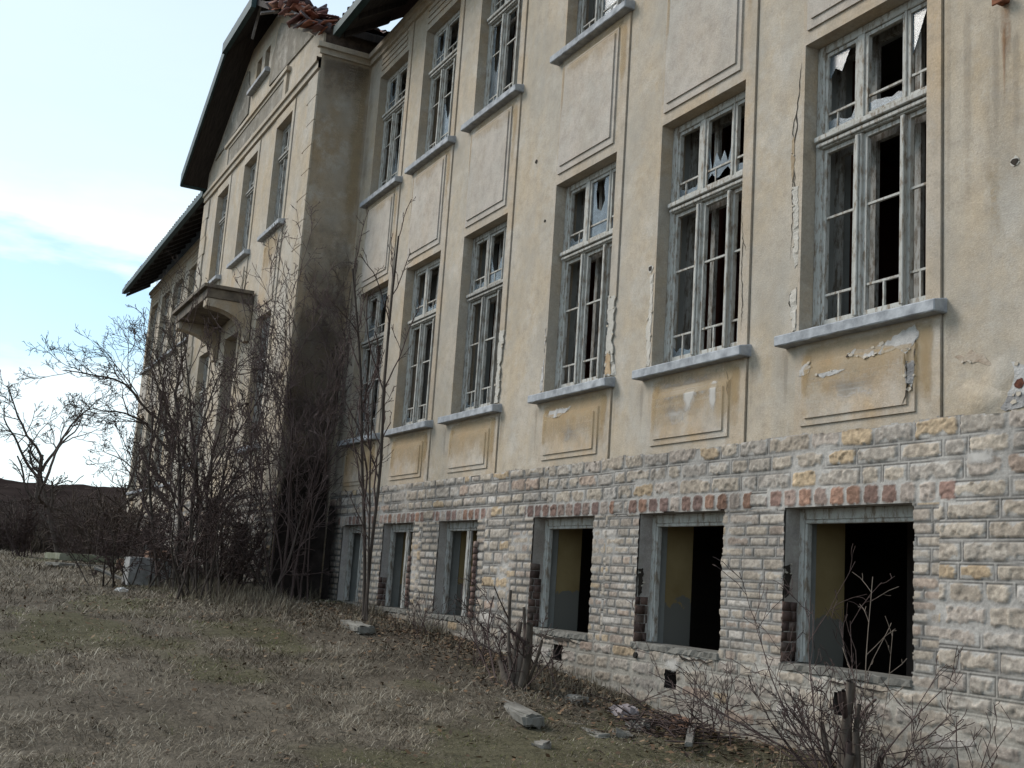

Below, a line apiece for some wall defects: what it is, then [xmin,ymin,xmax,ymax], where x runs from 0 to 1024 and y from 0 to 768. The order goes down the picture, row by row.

crack [792,62,802,143]
spalling [791,137,799,268]
spalling [604,295,617,376]
spalling [789,287,797,332]
spalling [799,325,920,391]
spalling [1000,362,1024,411]